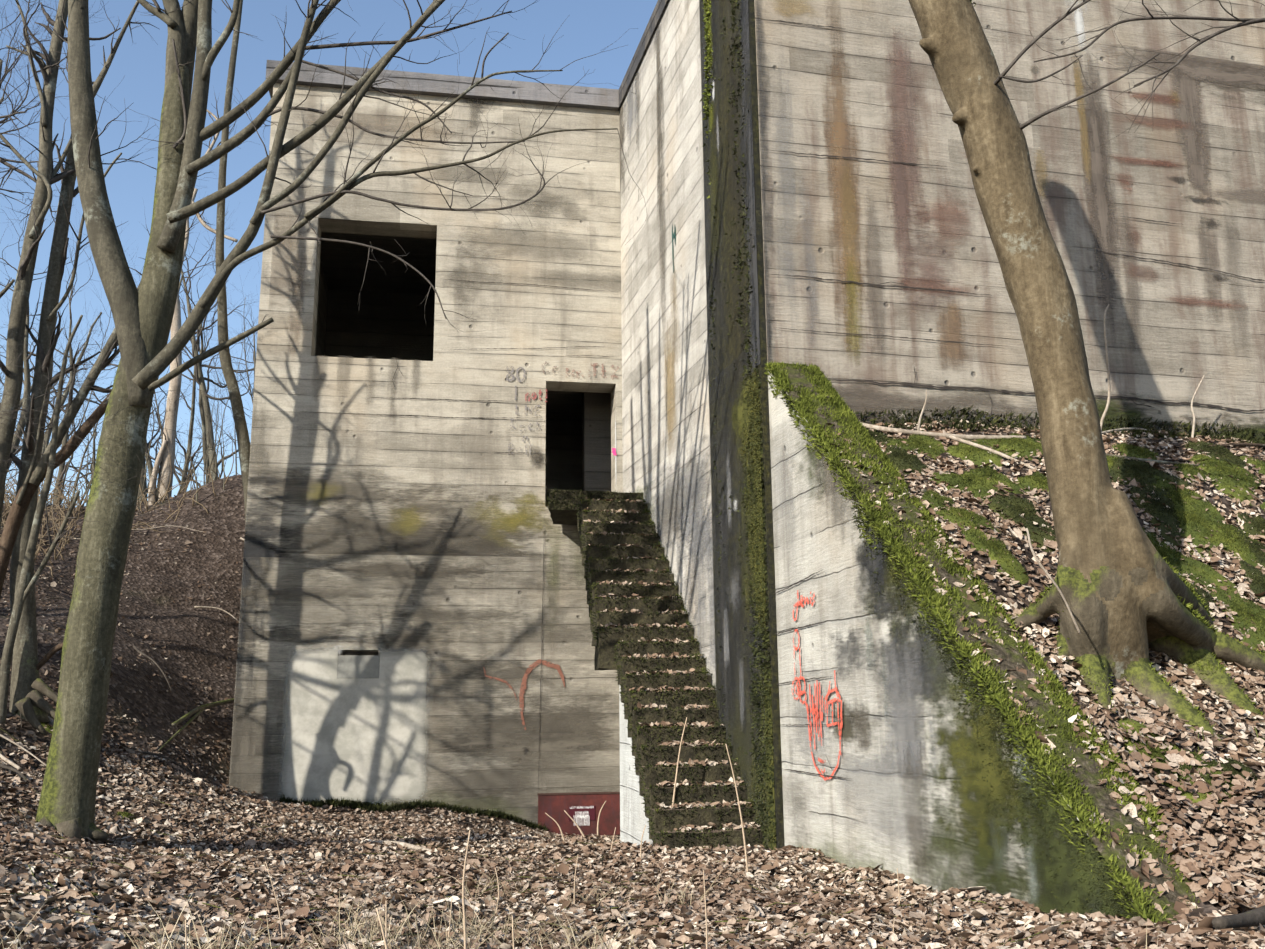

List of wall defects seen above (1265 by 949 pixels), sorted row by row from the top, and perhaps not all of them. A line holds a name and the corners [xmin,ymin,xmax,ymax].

rust [824,65,863,350]
rust [889,44,967,364]
rust [1120,158,1175,166]
rust [1132,93,1175,103]
rust [1135,119,1181,127]
rust [1173,298,1234,307]
damp [231,469,533,756]
damp [856,531,904,619]
damp [443,704,610,772]
damp [834,624,945,779]